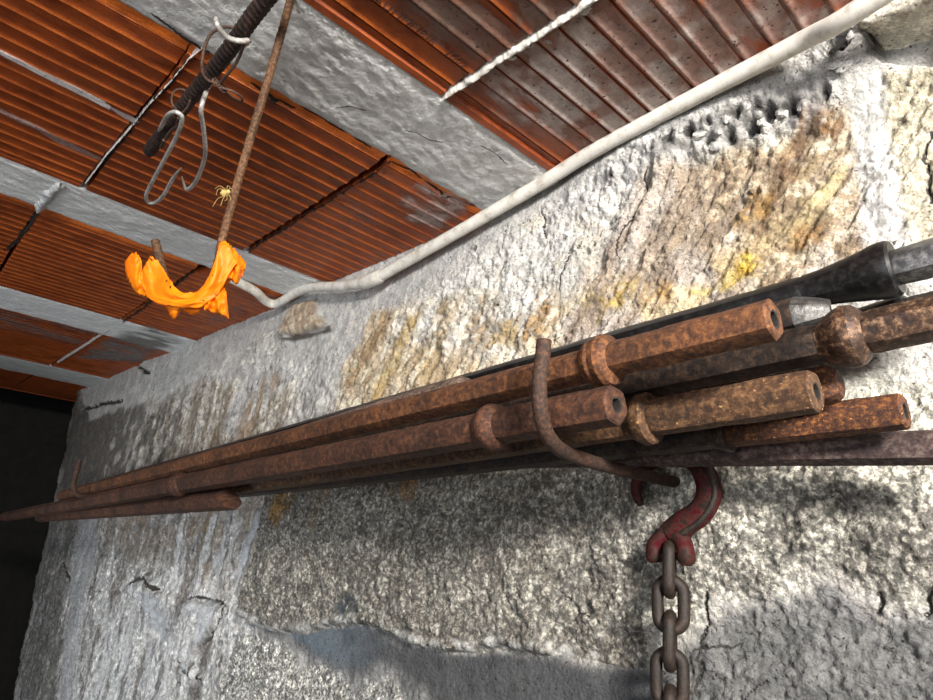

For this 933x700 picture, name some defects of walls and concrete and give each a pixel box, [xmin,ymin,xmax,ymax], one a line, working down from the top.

spalling [657,90,814,152]
corrosion [735,111,838,231]
crack [615,166,648,259]
corrosion [783,171,843,247]
corrosion [484,297,551,347]
corrosion [600,280,671,317]
corrosion [722,253,757,289]
crack [127,576,160,591]